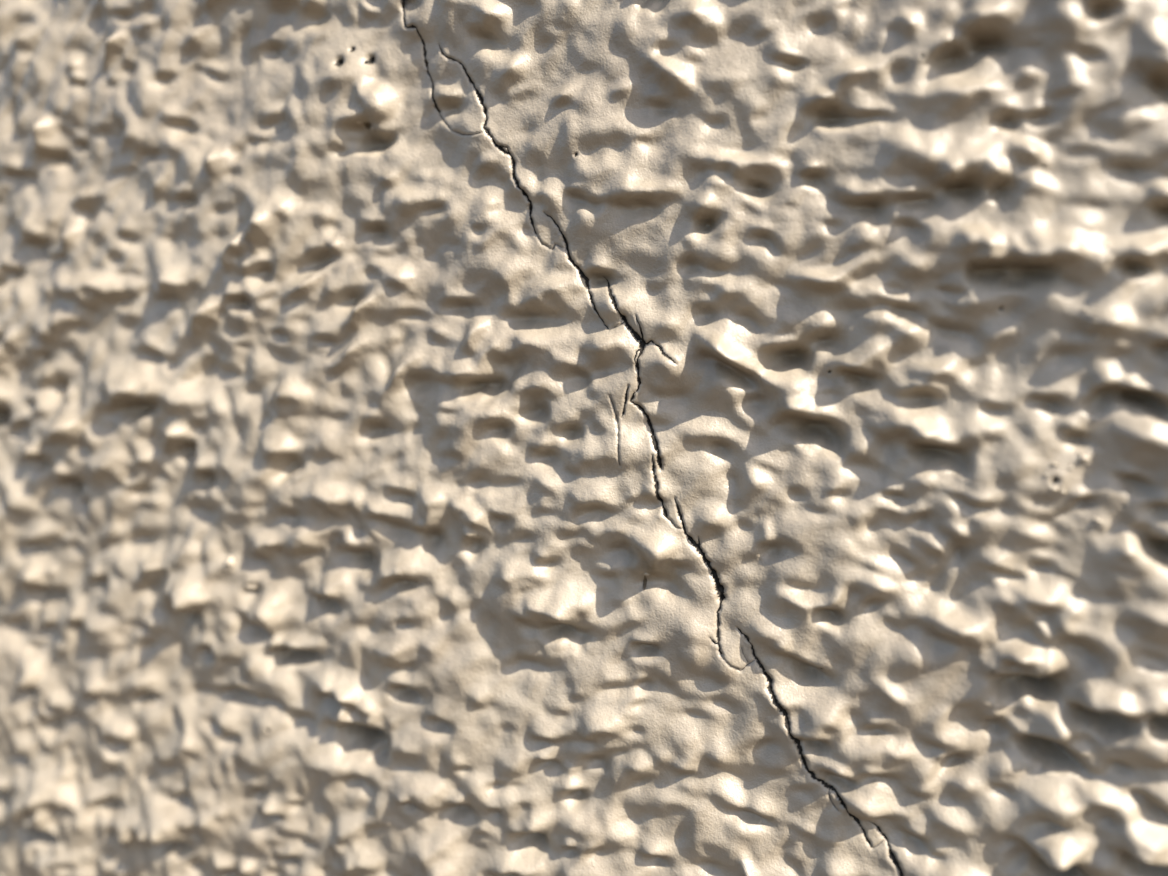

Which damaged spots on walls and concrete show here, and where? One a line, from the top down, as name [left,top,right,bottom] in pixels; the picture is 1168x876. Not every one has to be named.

crack [402,0,903,876]